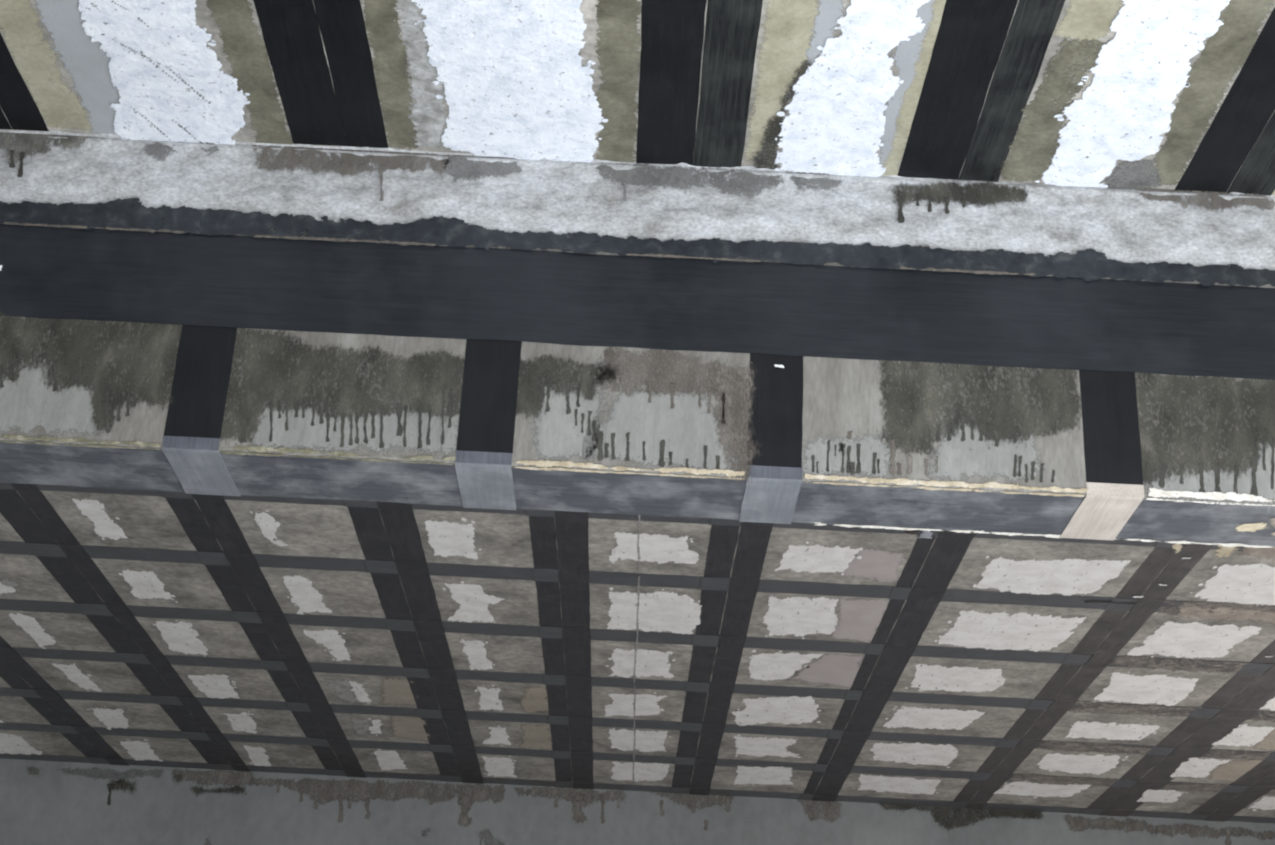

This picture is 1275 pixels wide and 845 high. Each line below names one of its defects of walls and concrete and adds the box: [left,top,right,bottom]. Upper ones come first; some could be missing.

peeling [78,0,250,145]
peeling [411,0,608,163]
peeling [774,0,930,177]
peeling [1035,0,1230,189]
damp [0,198,1275,287]
damp [894,181,1028,223]
damp [0,312,182,433]
damp [220,328,465,449]
damp [516,347,749,469]
damp [811,360,1081,483]
damp [1135,372,1275,496]
peeling [0,720,42,755]